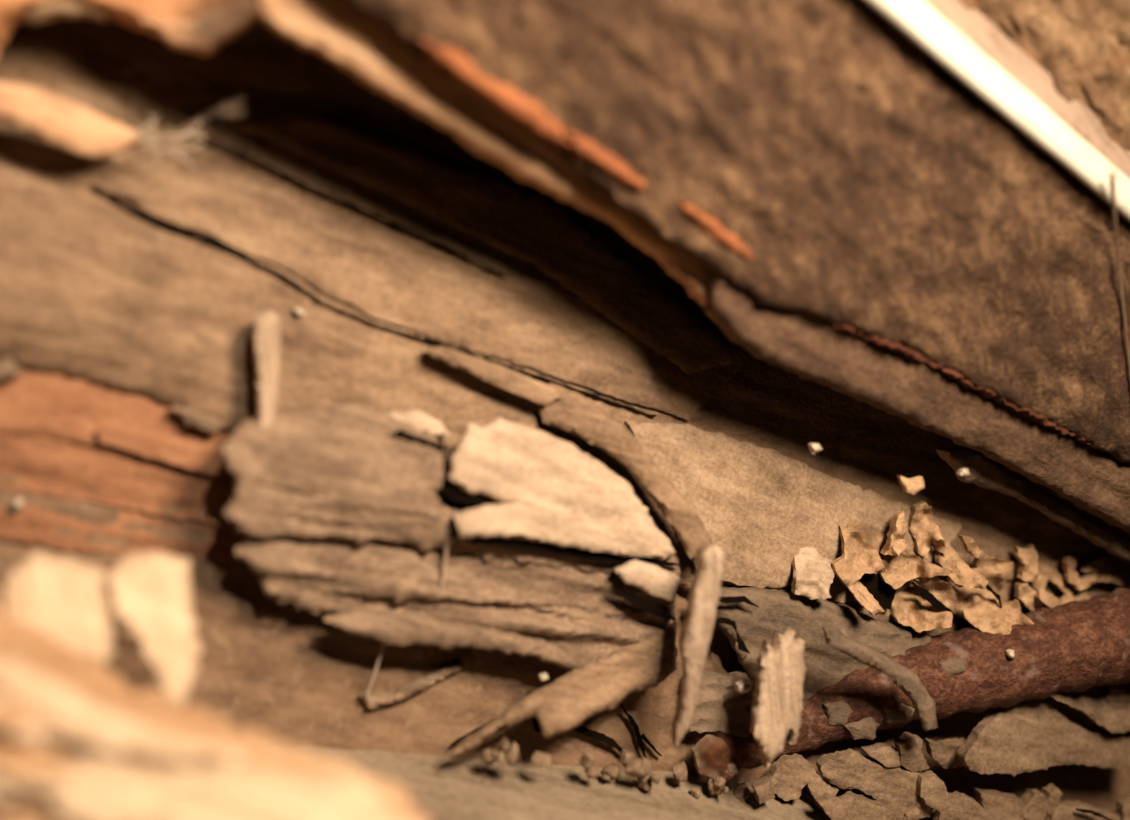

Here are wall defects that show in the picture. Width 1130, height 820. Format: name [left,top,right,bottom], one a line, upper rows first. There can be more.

crack [92,188,656,417]
peeling [0,46,1108,593]
crack [383,429,450,451]
peeling [222,401,678,754]
rust [704,666,920,776]
peeling [689,572,974,737]
rust [890,587,1130,720]
peeling [997,579,1064,614]
peeling [1087,581,1129,599]